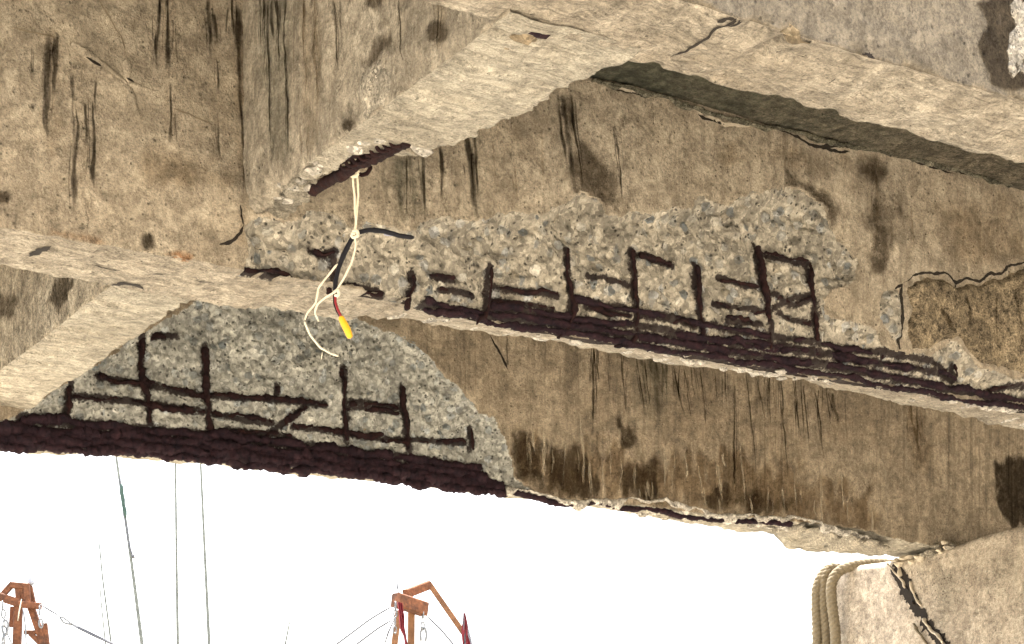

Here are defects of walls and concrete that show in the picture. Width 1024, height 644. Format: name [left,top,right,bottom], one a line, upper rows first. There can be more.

water stain [44,38,58,115]
water stain [152,1,170,62]
water stain [207,0,242,118]
crack [671,17,741,57]
water stain [980,0,1024,89]
water stain [76,84,96,179]
water stain [559,98,609,199]
spalling [0,185,1024,553]
water stain [591,351,609,417]
water stain [746,377,834,450]
water stain [995,457,1024,528]
crack [886,562,950,644]